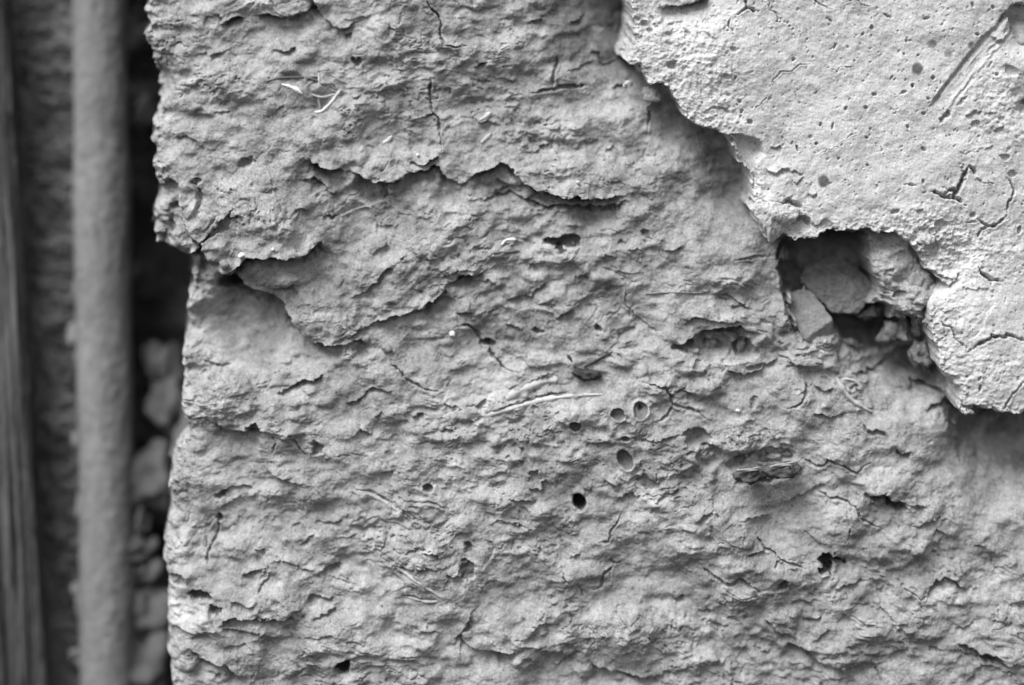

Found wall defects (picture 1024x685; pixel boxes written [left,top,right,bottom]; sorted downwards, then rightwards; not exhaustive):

spalling [615,0,1024,463]
crack [933,167,981,203]
crack [977,184,1015,236]
spalling [817,552,847,575]